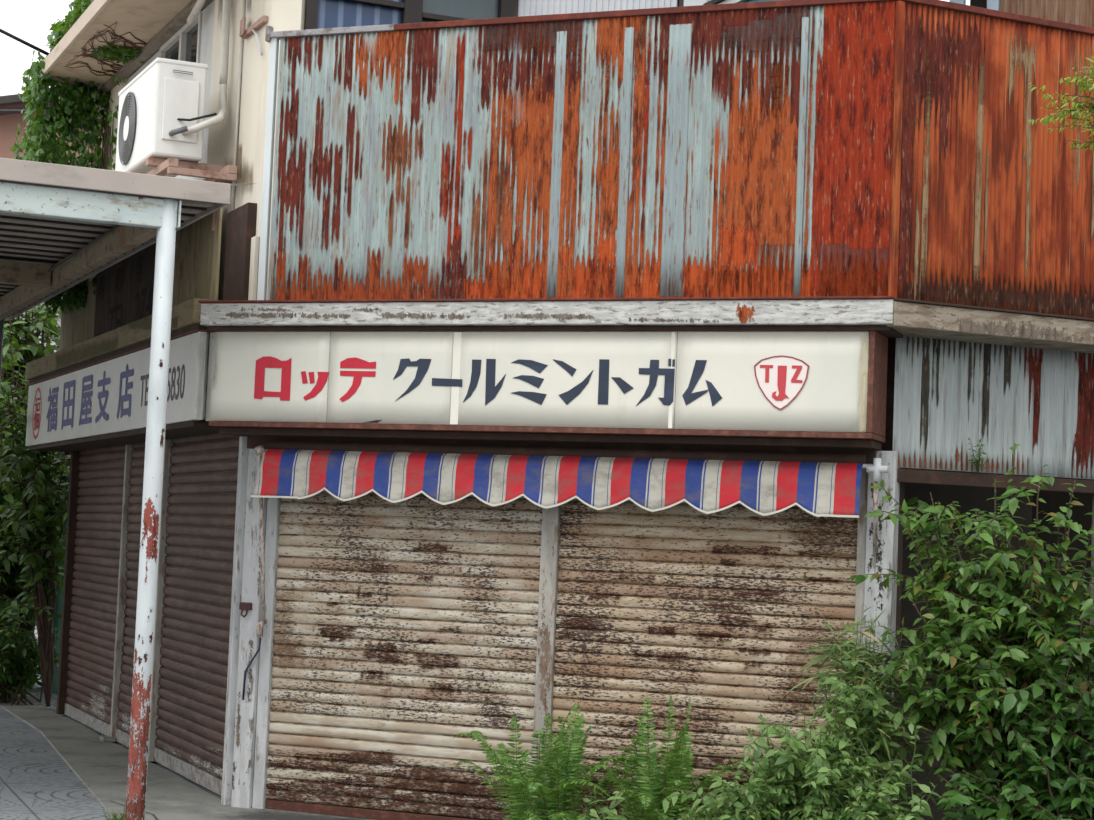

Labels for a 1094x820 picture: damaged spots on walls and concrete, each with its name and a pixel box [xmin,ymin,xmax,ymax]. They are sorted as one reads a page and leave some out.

corrosion [273,1,1094,323]
corrosion [898,347,1044,474]
corrosion [1071,352,1094,478]
corrosion [413,542,449,552]
corrosion [712,543,831,566]
corrosion [316,623,357,643]
corrosion [356,626,462,695]
corrosion [558,613,594,640]
corrosion [632,588,779,670]
corrosion [266,749,518,820]